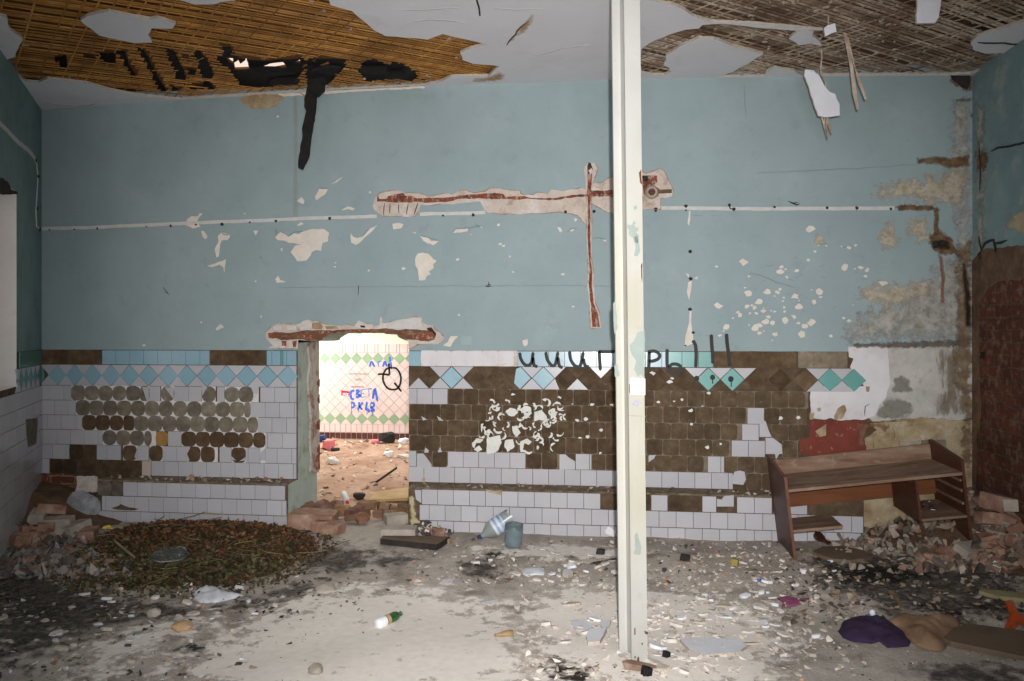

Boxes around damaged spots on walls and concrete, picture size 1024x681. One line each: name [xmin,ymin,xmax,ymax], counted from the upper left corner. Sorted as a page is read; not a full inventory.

spalling [950,75,972,102]
peeling [187,213,230,272]
peeling [275,222,329,261]
peeling [297,177,342,204]
peeling [351,212,438,280]
flaking render [627,168,674,256]
crack [978,141,1024,191]
peeling [210,315,619,470]
peeling [630,245,1024,525]
peeling [42,385,265,510]
peeling [601,493,617,510]